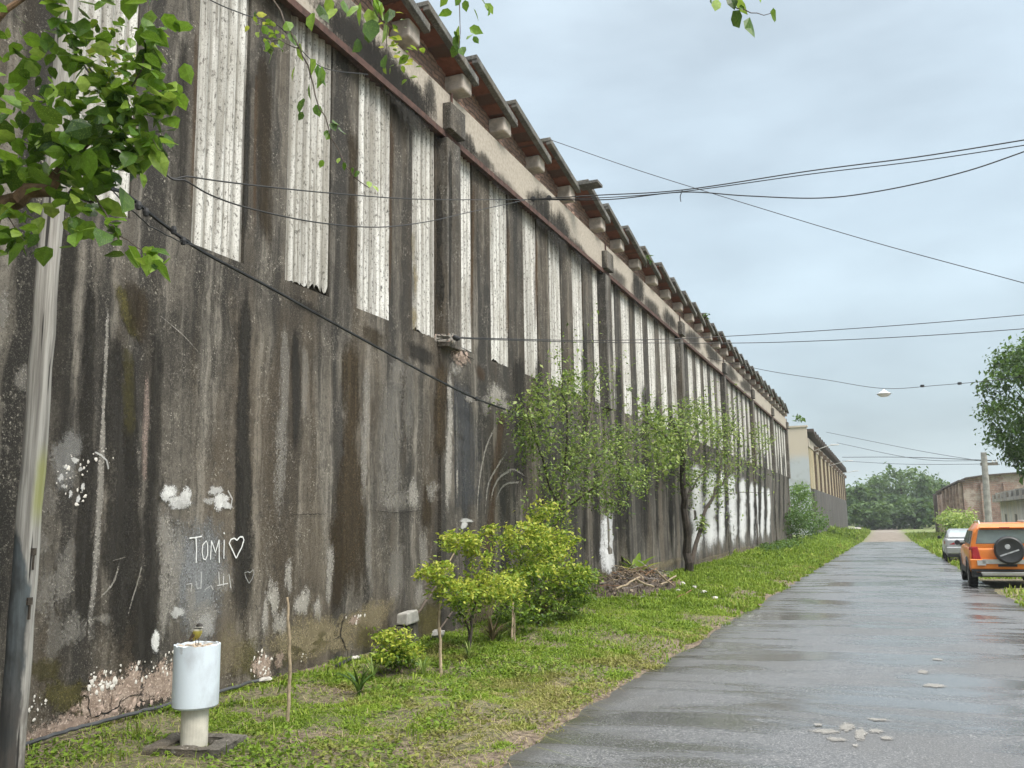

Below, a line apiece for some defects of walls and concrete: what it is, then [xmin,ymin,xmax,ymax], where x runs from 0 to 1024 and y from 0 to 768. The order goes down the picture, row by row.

damp [243,60,272,240]
damp [346,132,358,288]
damp [435,152,453,305]
damp [527,192,589,269]
damp [612,271,751,393]
damp [54,243,254,670]
damp [262,327,385,633]
damp [411,345,544,516]
damp [582,336,601,561]
damp [615,369,675,561]
damp [702,437,785,539]
flaking render [26,651,173,741]